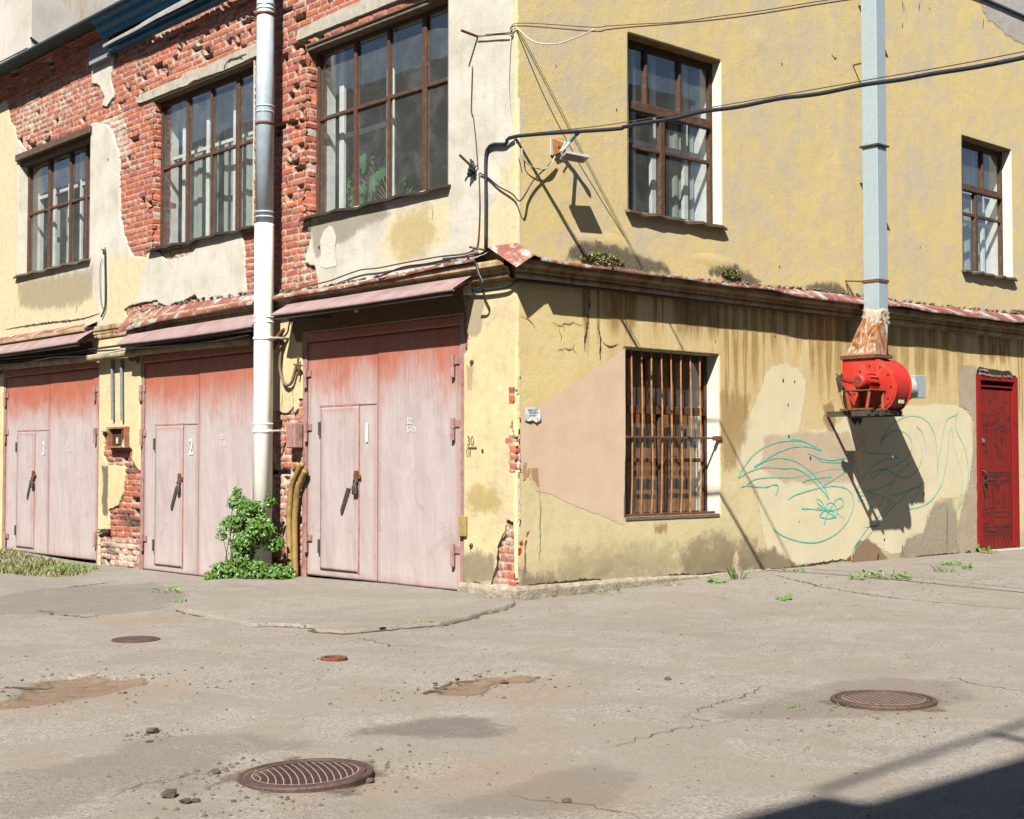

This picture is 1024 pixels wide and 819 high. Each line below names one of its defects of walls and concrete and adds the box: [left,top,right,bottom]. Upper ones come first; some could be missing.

spalling [0,0,257,294]
spalling [273,0,419,292]
crack [520,301,617,357]
leakage [654,297,788,391]
leakage [801,315,850,384]
leakage [887,325,961,372]
leakage [979,335,1022,383]
spalling [100,432,140,569]
spalling [494,379,521,586]